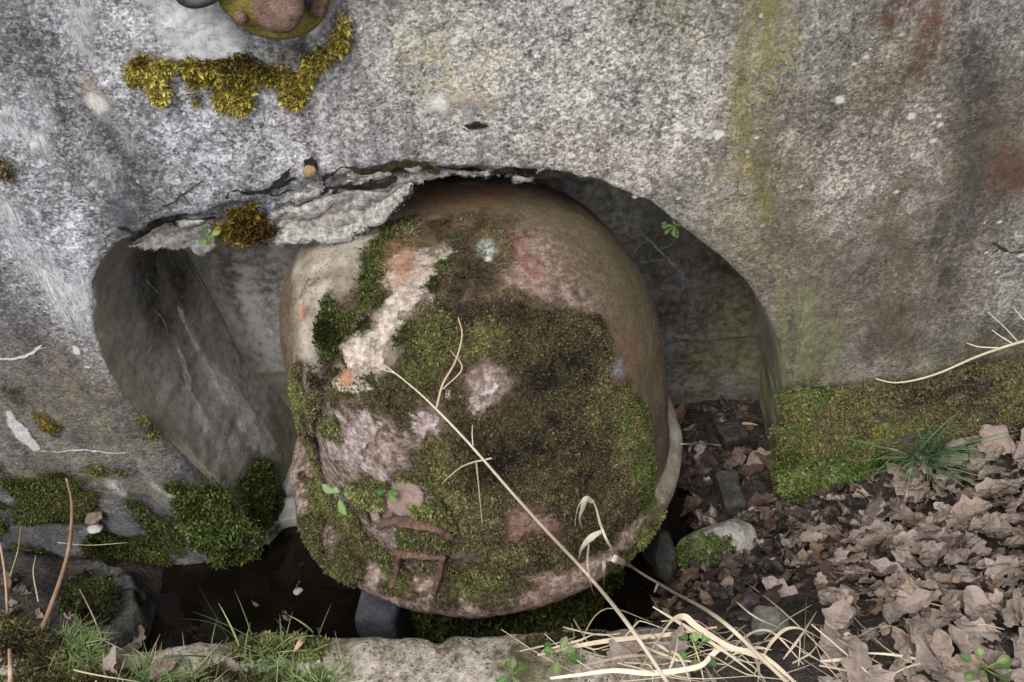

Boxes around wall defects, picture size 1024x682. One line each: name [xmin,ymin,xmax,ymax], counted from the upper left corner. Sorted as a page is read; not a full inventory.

crack [117,159,600,242]
spalling [129,215,221,286]